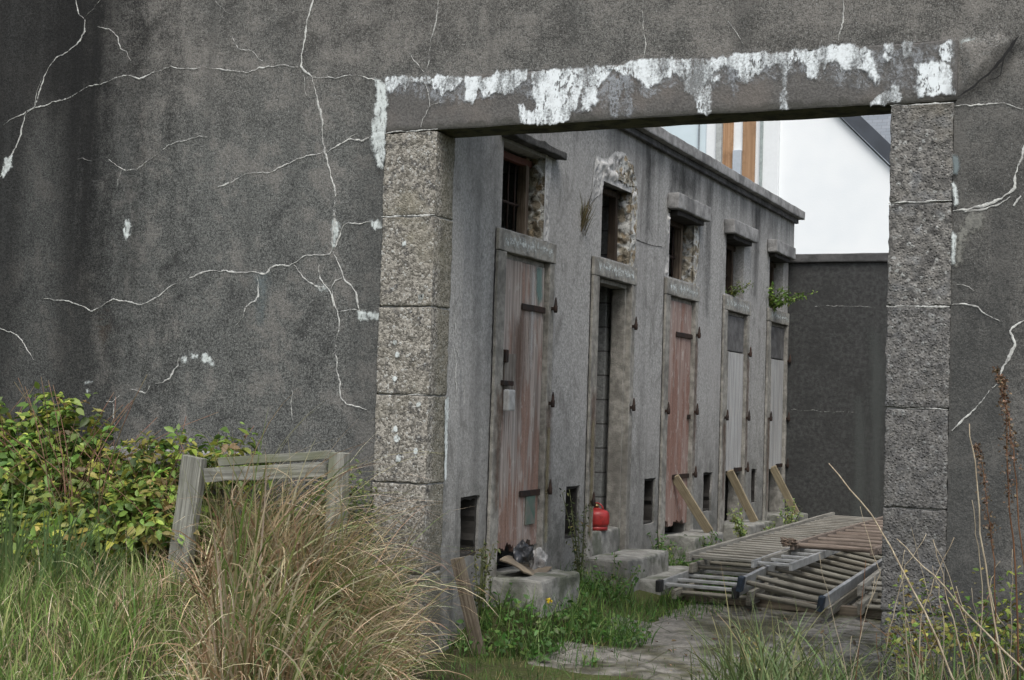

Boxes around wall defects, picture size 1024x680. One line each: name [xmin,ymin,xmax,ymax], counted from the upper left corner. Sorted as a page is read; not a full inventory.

peeling [385,38,971,125]
crack [0,0,375,410]
crack [953,146,1024,212]
crack [106,358,179,439]
crack [951,284,1024,431]